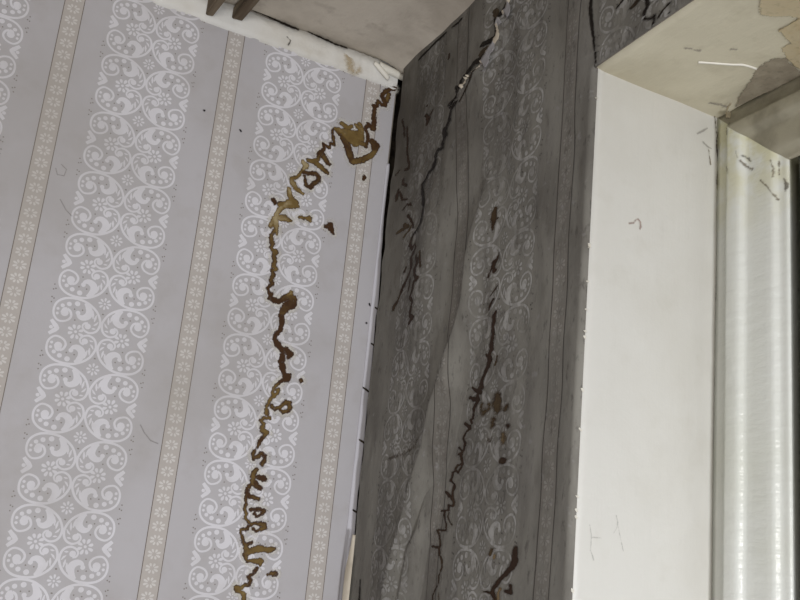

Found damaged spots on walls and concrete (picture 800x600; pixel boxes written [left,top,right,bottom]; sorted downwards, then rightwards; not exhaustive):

crack [372,79,403,360]
crack [413,3,506,235]
spalling [698,0,800,107]
crack [355,417,367,535]